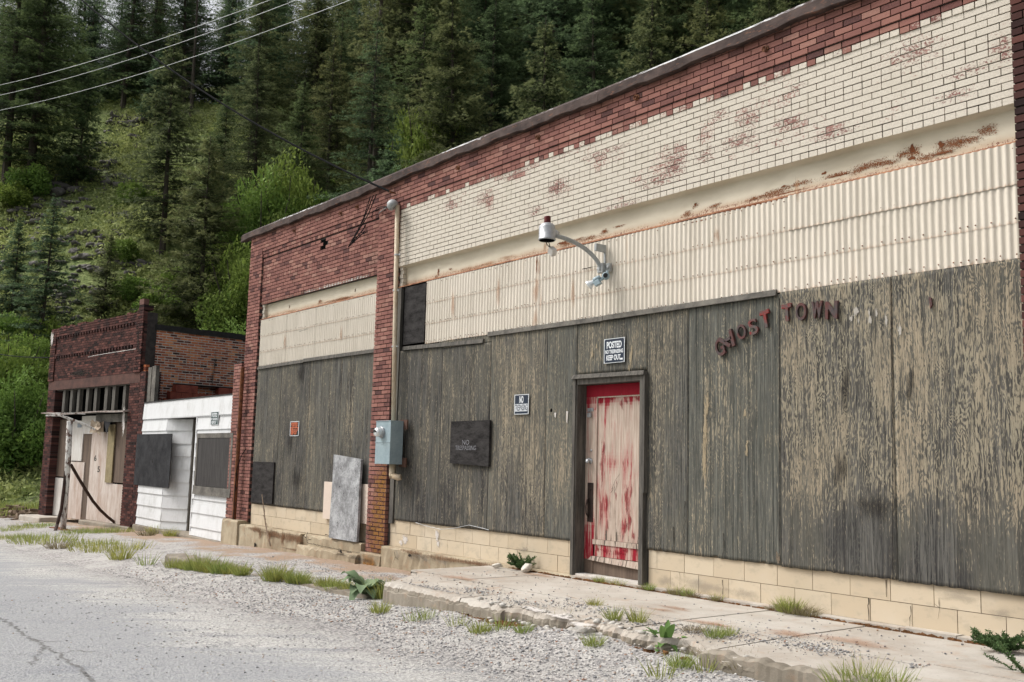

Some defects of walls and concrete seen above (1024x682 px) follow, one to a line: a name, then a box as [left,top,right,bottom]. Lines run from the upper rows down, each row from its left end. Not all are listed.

peeling [924,32,1010,104]
corrosion [683,124,998,223]
peeling [599,443,634,538]